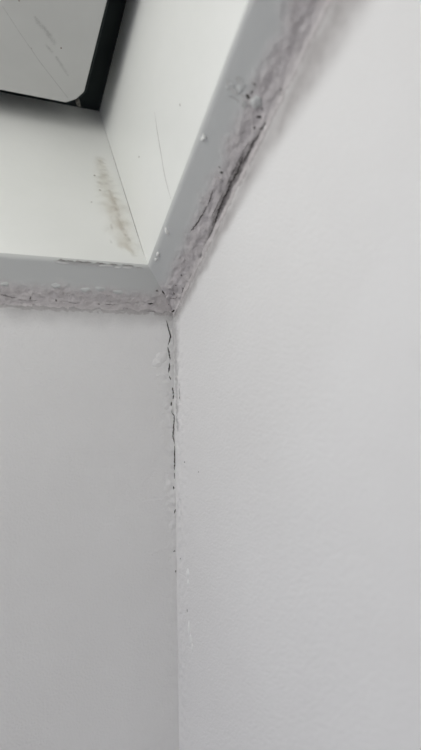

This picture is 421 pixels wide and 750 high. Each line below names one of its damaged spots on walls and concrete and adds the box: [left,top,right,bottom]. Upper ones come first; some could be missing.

crack [191,123,265,236]
crack [148,274,190,490]